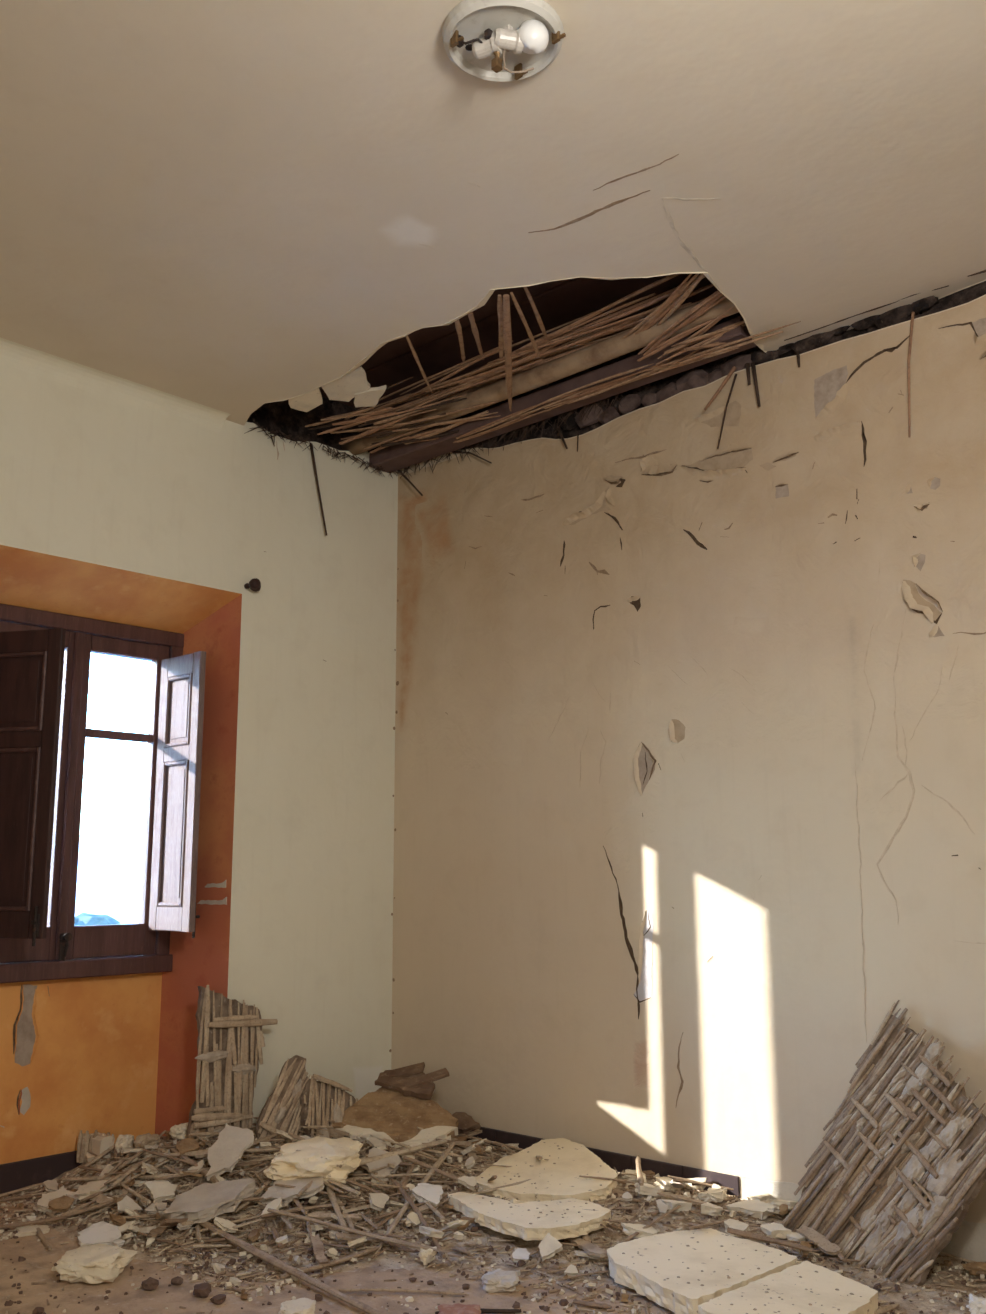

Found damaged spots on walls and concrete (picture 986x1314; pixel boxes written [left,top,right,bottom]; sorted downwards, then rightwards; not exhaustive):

crack [528,154,721,272]
crack [847,335,910,381]
peeling [939,318,986,360]
crack [683,523,733,550]
peeling [902,553,944,638]
spalling [669,719,686,743]
spalling [633,742,656,795]
crack [855,610,986,1043]
crack [603,846,640,1019]
spalling [13,984,39,1066]
spalling [16,1087,31,1115]
crack [676,1033,684,1106]